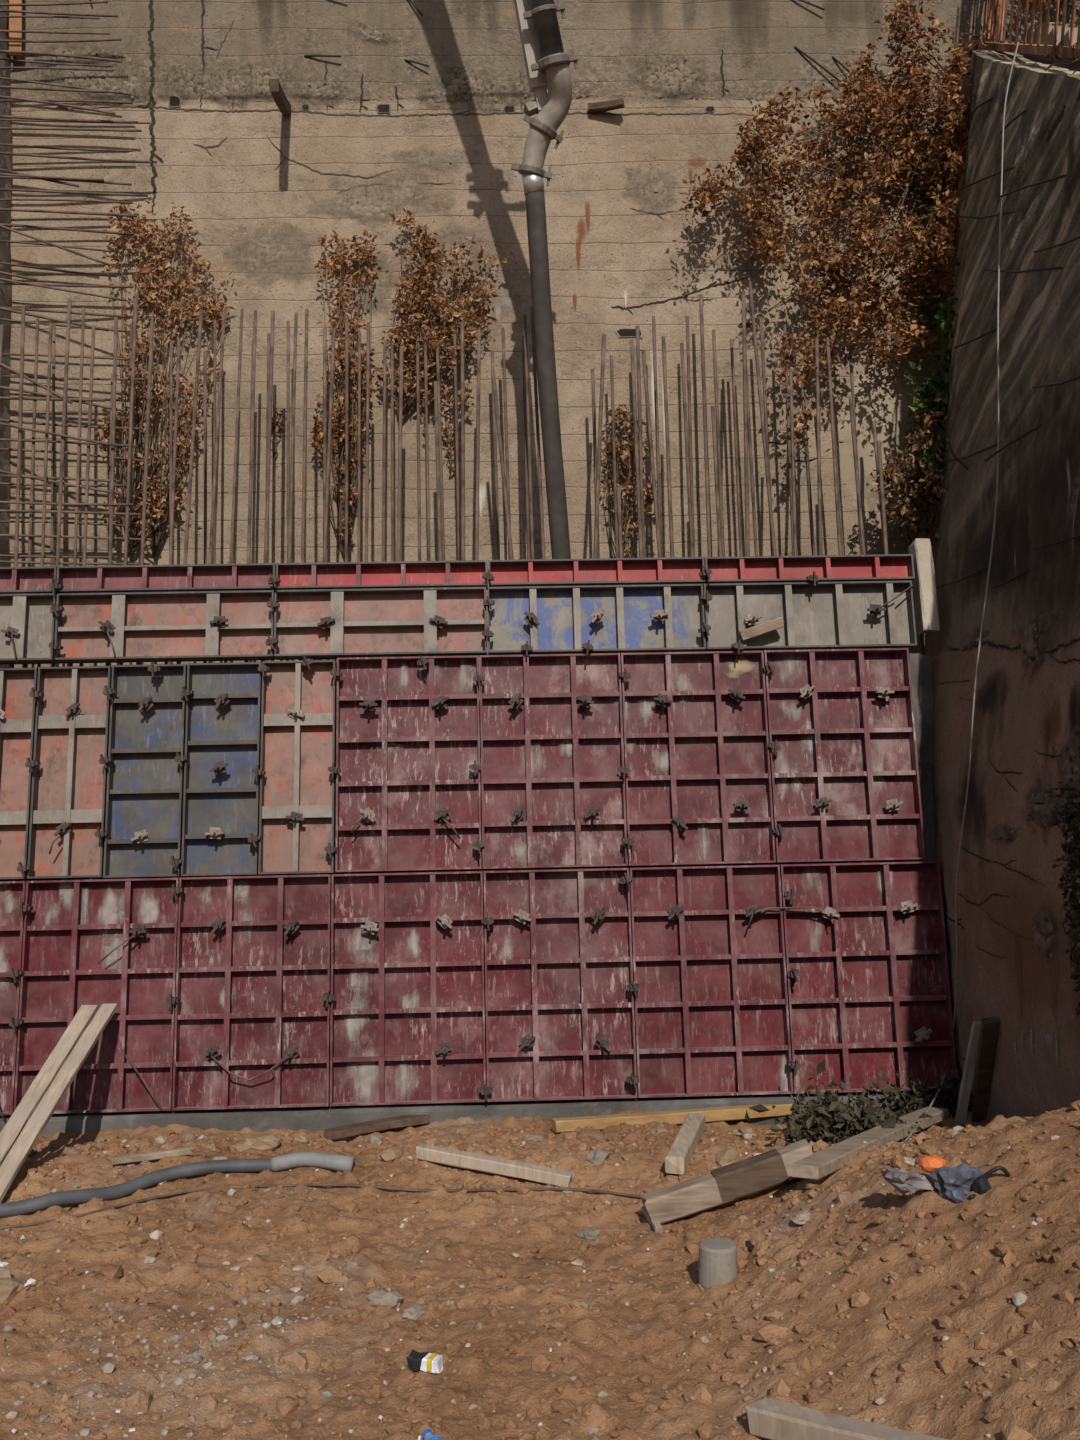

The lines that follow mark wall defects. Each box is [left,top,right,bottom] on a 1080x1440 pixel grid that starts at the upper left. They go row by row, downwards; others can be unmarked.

crack [29,0,525,214]
crack [568,50,759,116]
spalling [0,0,154,567]
spalling [420,228,479,274]
spalling [169,339,181,565]
spalling [203,309,275,564]
spalling [288,255,545,563]
crack [936,637,1080,700]